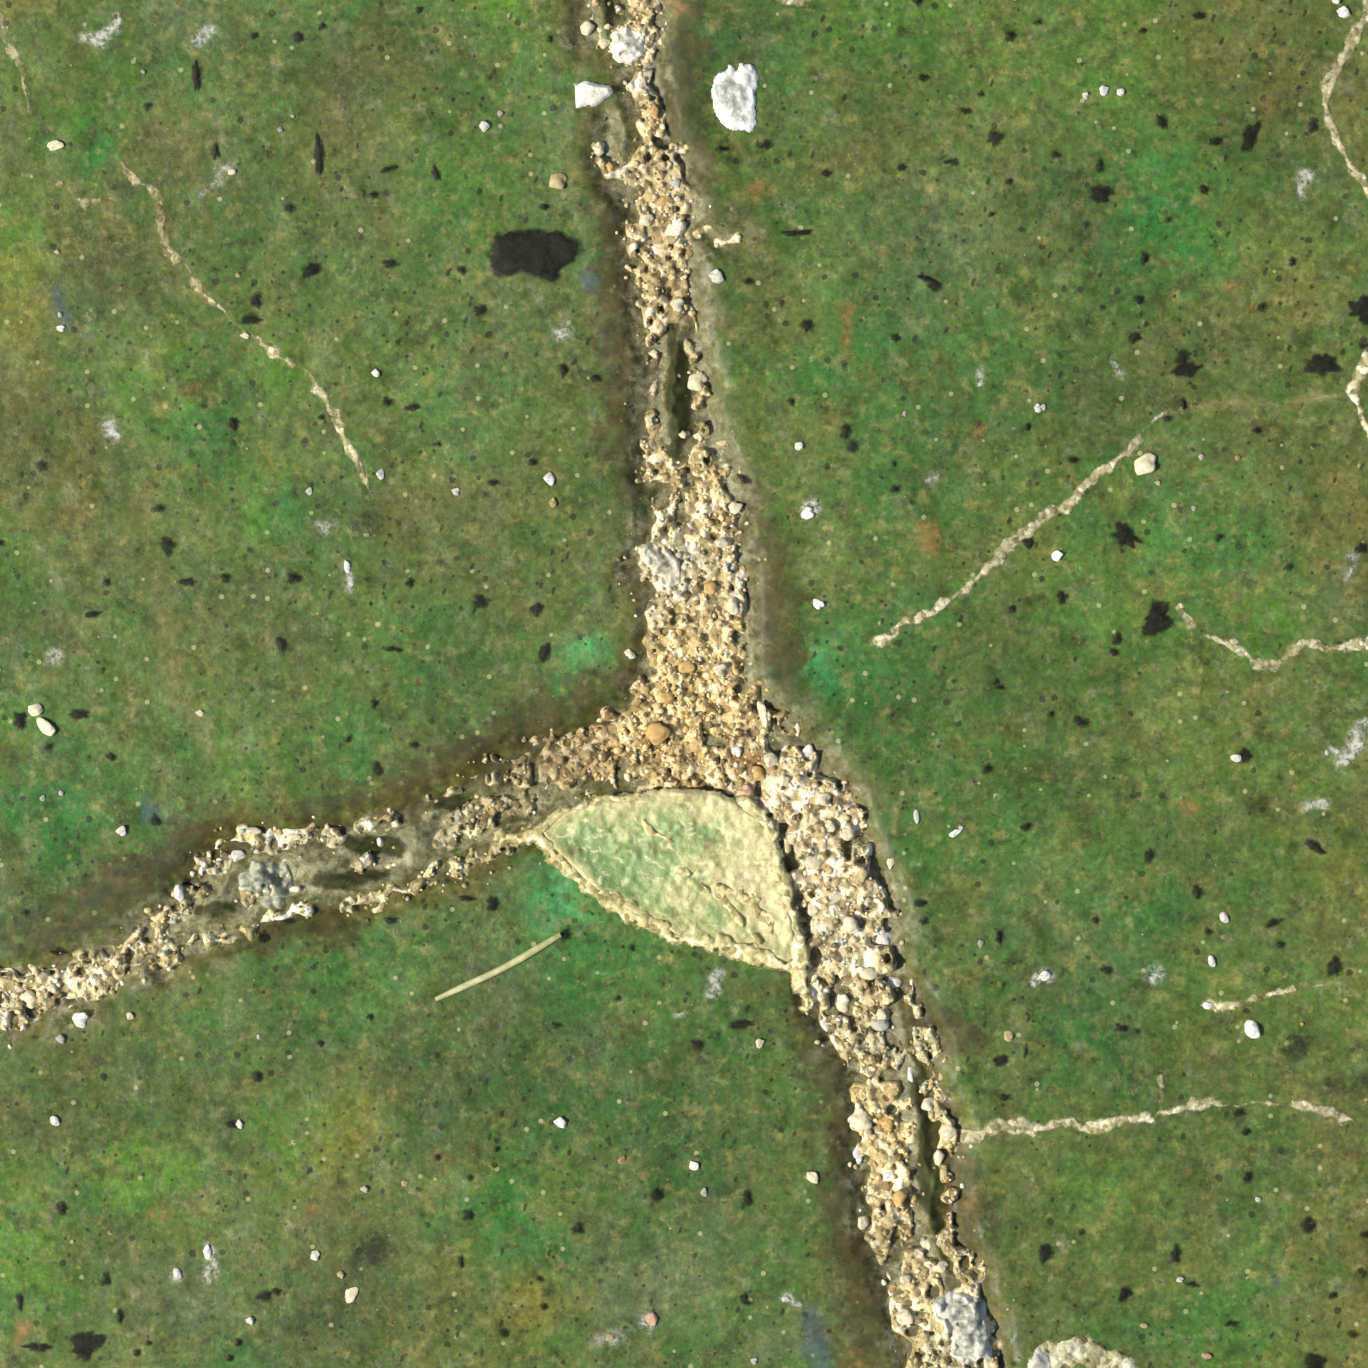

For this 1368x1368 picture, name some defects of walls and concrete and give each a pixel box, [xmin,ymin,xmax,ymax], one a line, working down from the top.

crack [0,13,26,89]
crack [1321,0,1368,197]
crack [51,162,369,483]
crack [1347,349,1368,433]
crack [1178,603,1368,670]
crack [340,0,1168,1368]
crack [0,810,406,1031]
crack [1161,1096,1223,1115]
crack [1244,1100,1352,1123]
peeling [1027,1347,1051,1368]